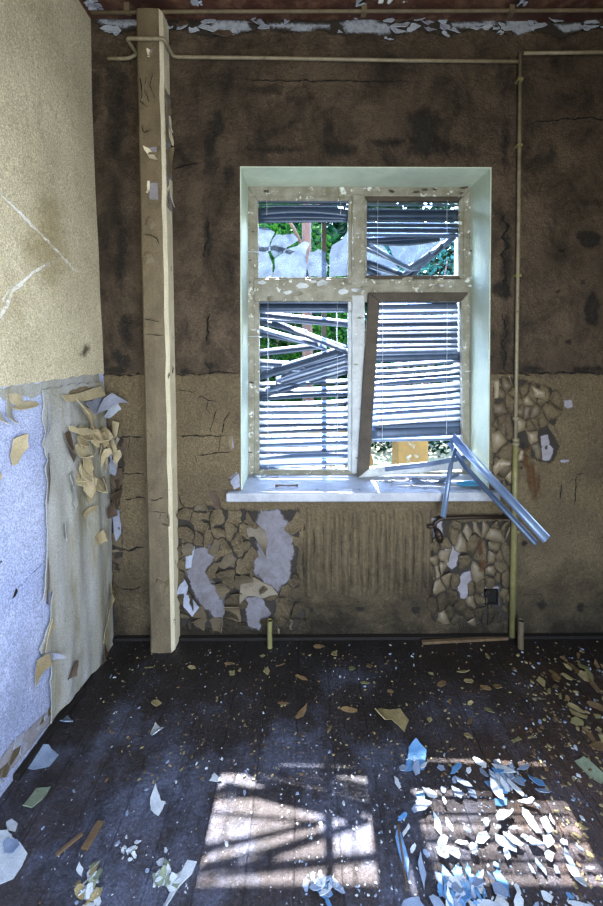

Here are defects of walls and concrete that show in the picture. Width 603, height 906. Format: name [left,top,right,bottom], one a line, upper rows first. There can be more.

peeling [84,0,137,36]
peeling [166,16,603,40]
peeling [143,88,175,212]
water stain [493,235,511,298]
crack [175,314,241,463]
peeling [492,375,573,487]
peeling [0,374,128,784]
peeling [176,491,306,634]
peeling [426,516,511,629]
peeling [23,786,51,808]